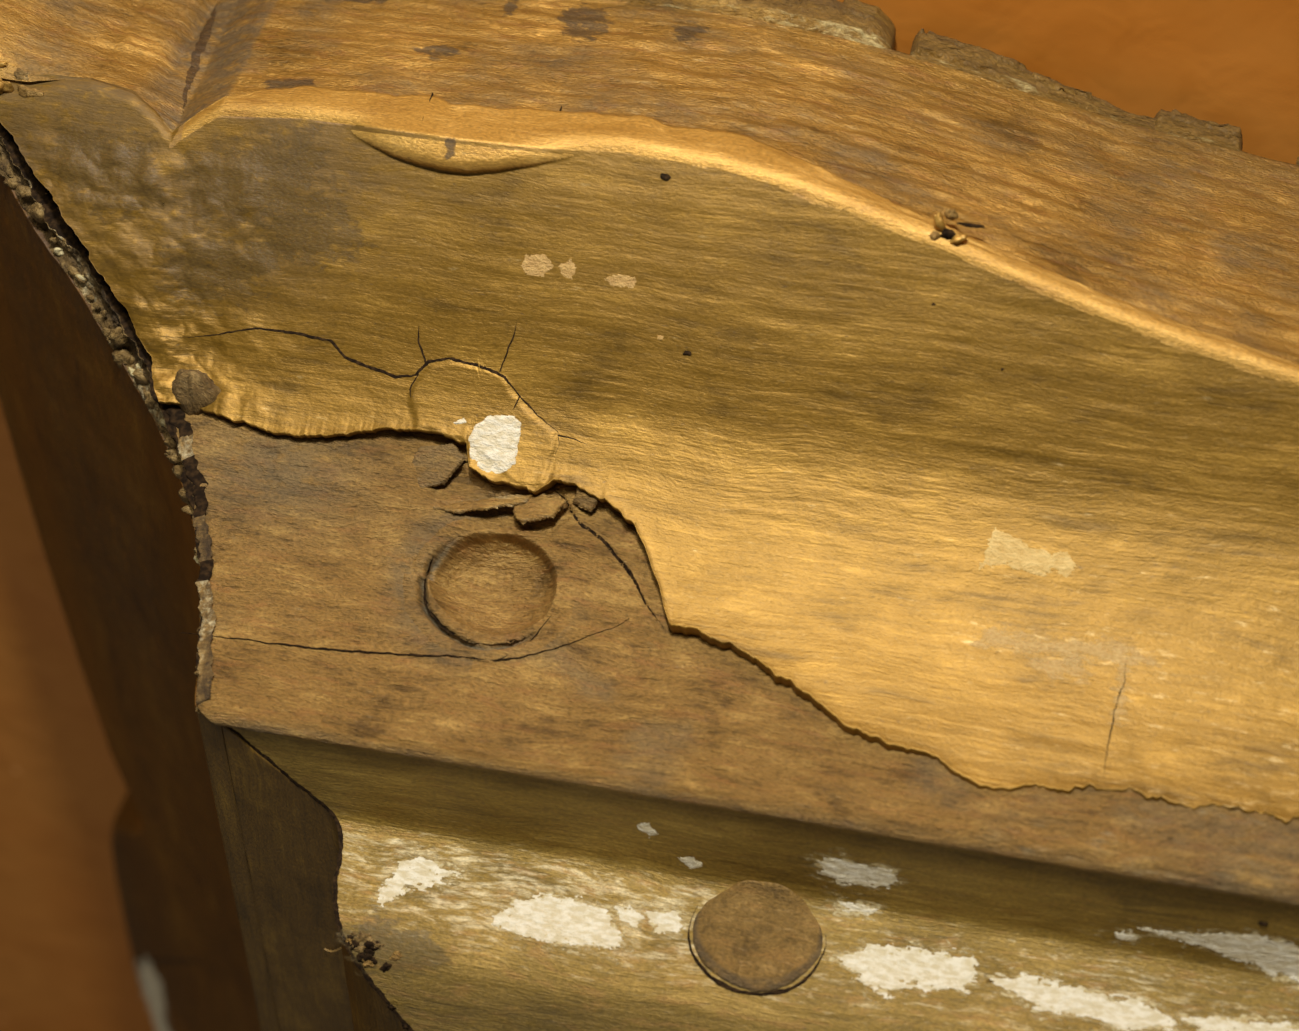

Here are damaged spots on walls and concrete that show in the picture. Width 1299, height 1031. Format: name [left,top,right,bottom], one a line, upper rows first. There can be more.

spalling [0,61,44,98]
crack [0,123,664,1031]
peeling [176,412,1299,908]
peeling [808,848,906,921]
peeling [484,891,691,960]
peeling [822,939,1299,1031]
peeling [1113,921,1299,990]